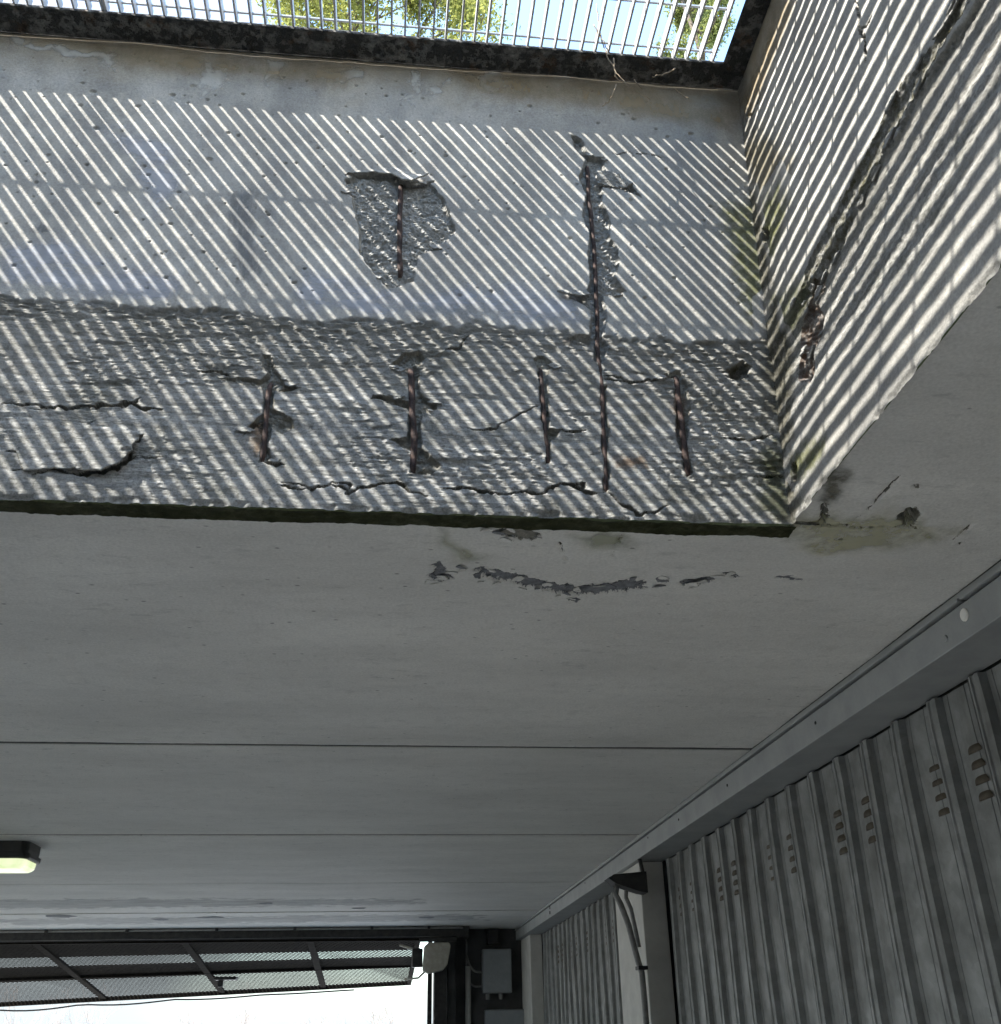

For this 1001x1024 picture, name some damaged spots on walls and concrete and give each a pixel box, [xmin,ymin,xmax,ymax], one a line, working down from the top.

spalling [341,168,456,288]
spalling [790,0,982,383]
spalling [554,134,642,493]
peeling [16,422,141,472]
crack [4,399,163,478]
spalling [217,355,302,464]
spalling [368,350,443,475]
spalling [533,356,562,465]
spalling [653,371,693,477]
hole [726,360,752,380]
crack [265,462,667,556]
peeling [424,561,740,603]